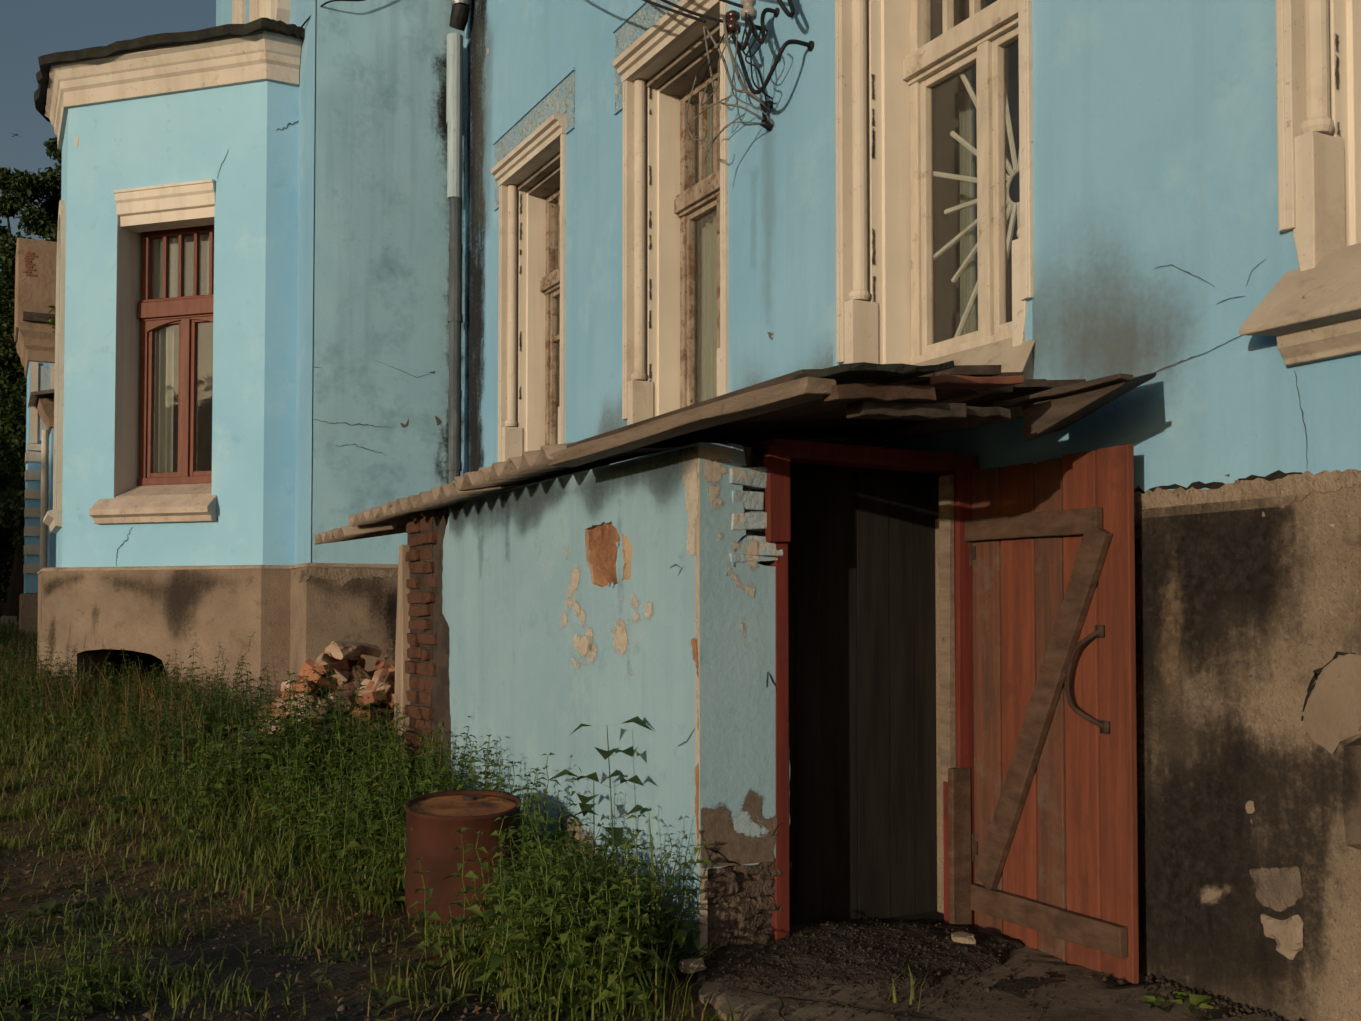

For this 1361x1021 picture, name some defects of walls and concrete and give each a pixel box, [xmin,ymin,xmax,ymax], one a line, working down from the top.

crack [1157,260,1264,304]
crack [1153,335,1242,373]
crack [315,419,391,455]
crack [1134,370,1308,494]
water stain [115,570,212,633]
flaking render [562,523,653,667]
flaking render [701,790,792,950]
flaking render [1261,914,1303,960]